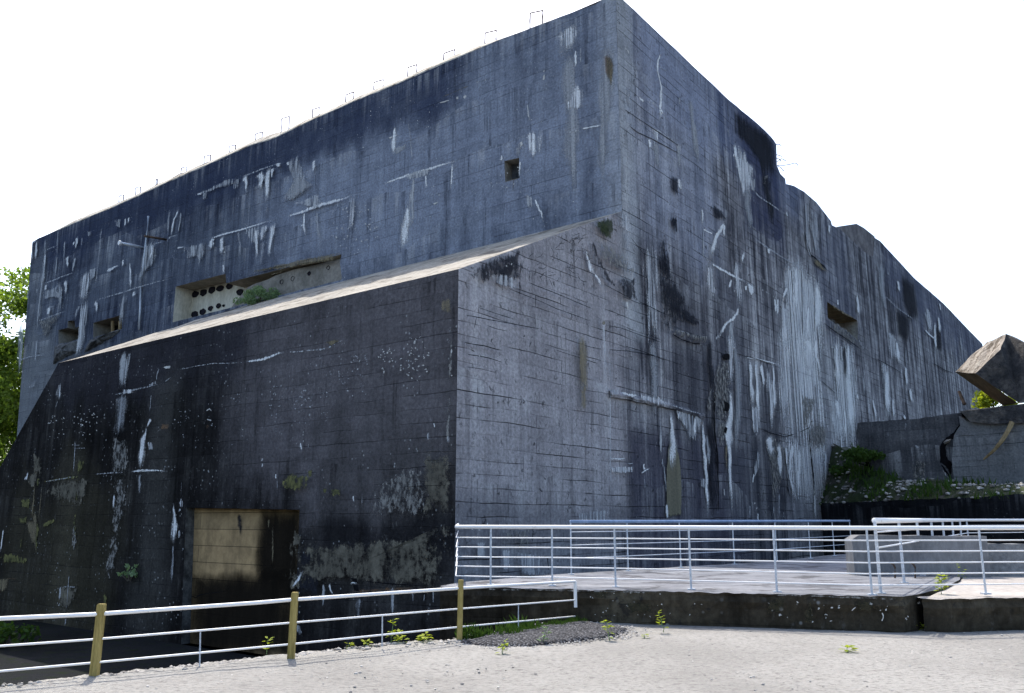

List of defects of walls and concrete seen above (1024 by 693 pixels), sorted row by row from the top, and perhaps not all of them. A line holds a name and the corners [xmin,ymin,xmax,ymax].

damp [198,163,280,199]
damp [728,111,775,224]
damp [178,223,275,263]
damp [471,249,524,294]
damp [119,354,130,384]
damp [612,217,710,517]
damp [702,203,942,517]
damp [106,397,153,578]
peeling [373,455,450,515]
damp [171,501,183,578]
damp [190,510,301,655]
peeling [290,528,449,602]